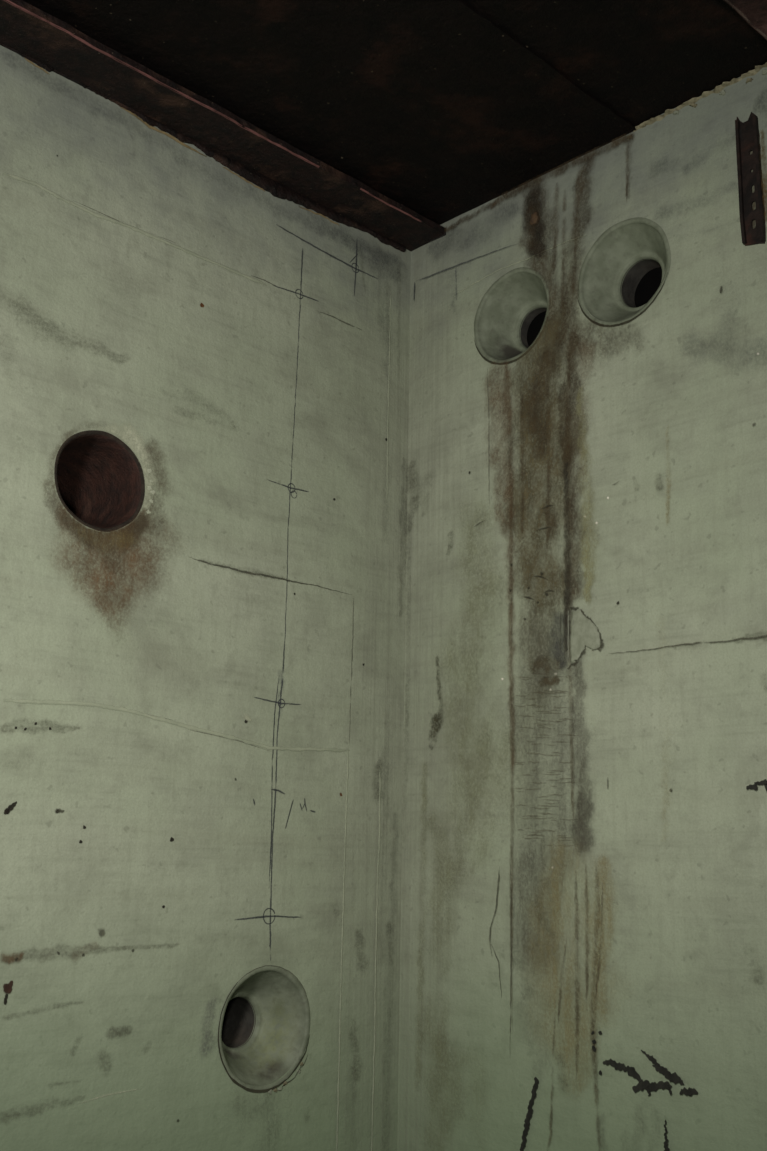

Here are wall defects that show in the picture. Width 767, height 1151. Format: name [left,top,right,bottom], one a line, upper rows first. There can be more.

rust [59,508,155,614]
crack [610,635,767,654]